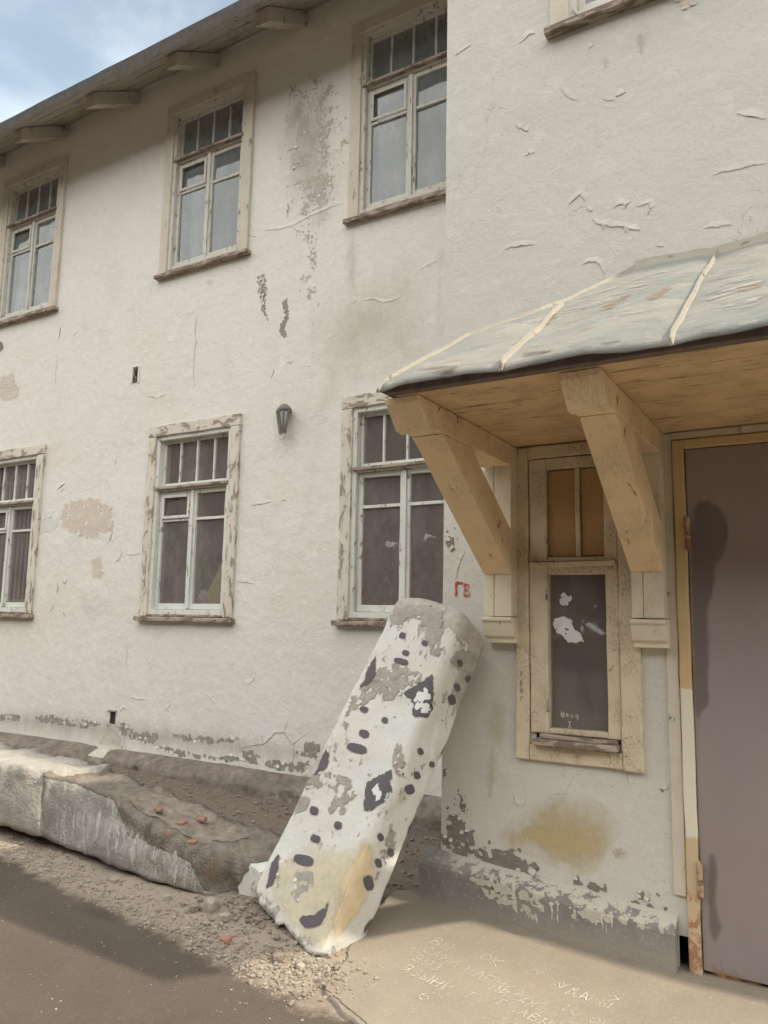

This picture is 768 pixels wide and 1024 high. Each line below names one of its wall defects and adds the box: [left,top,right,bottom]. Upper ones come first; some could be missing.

crack [249,202,342,240]
peeling [280,73,349,305]
peeling [257,274,289,338]
peeling [0,373,19,401]
peeling [41,497,114,539]
peeling [35,715,100,729]
peeling [119,721,357,815]
peeling [439,789,669,934]